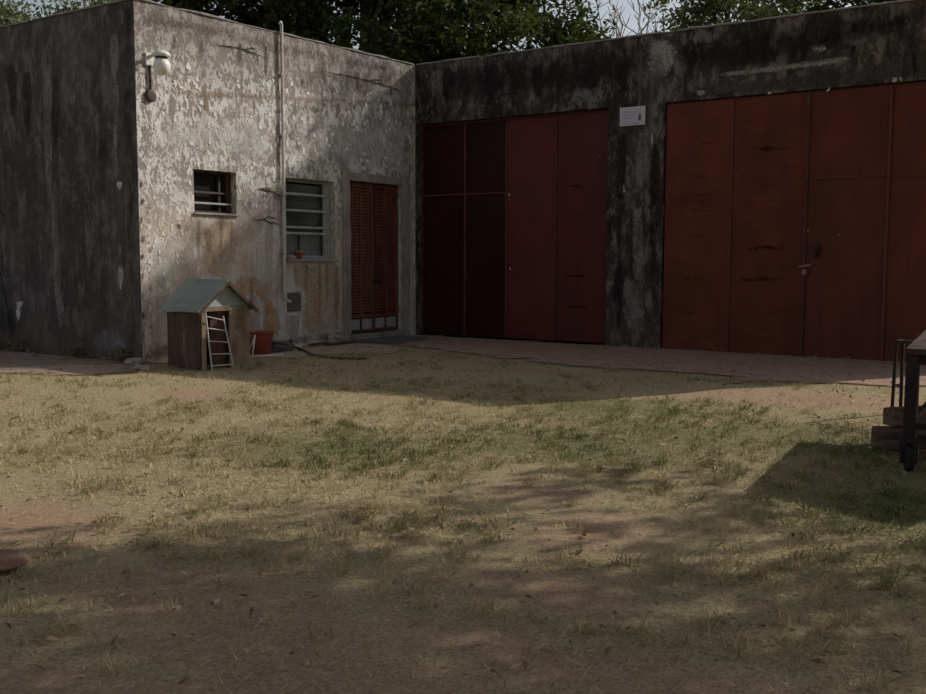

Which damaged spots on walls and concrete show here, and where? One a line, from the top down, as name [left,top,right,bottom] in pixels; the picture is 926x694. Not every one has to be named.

water stain [45,68,64,328]
water stain [99,14,129,165]
spalling [140,182,187,358]
peeling [154,63,275,210]
peeling [288,68,416,328]
water stain [442,49,634,102]